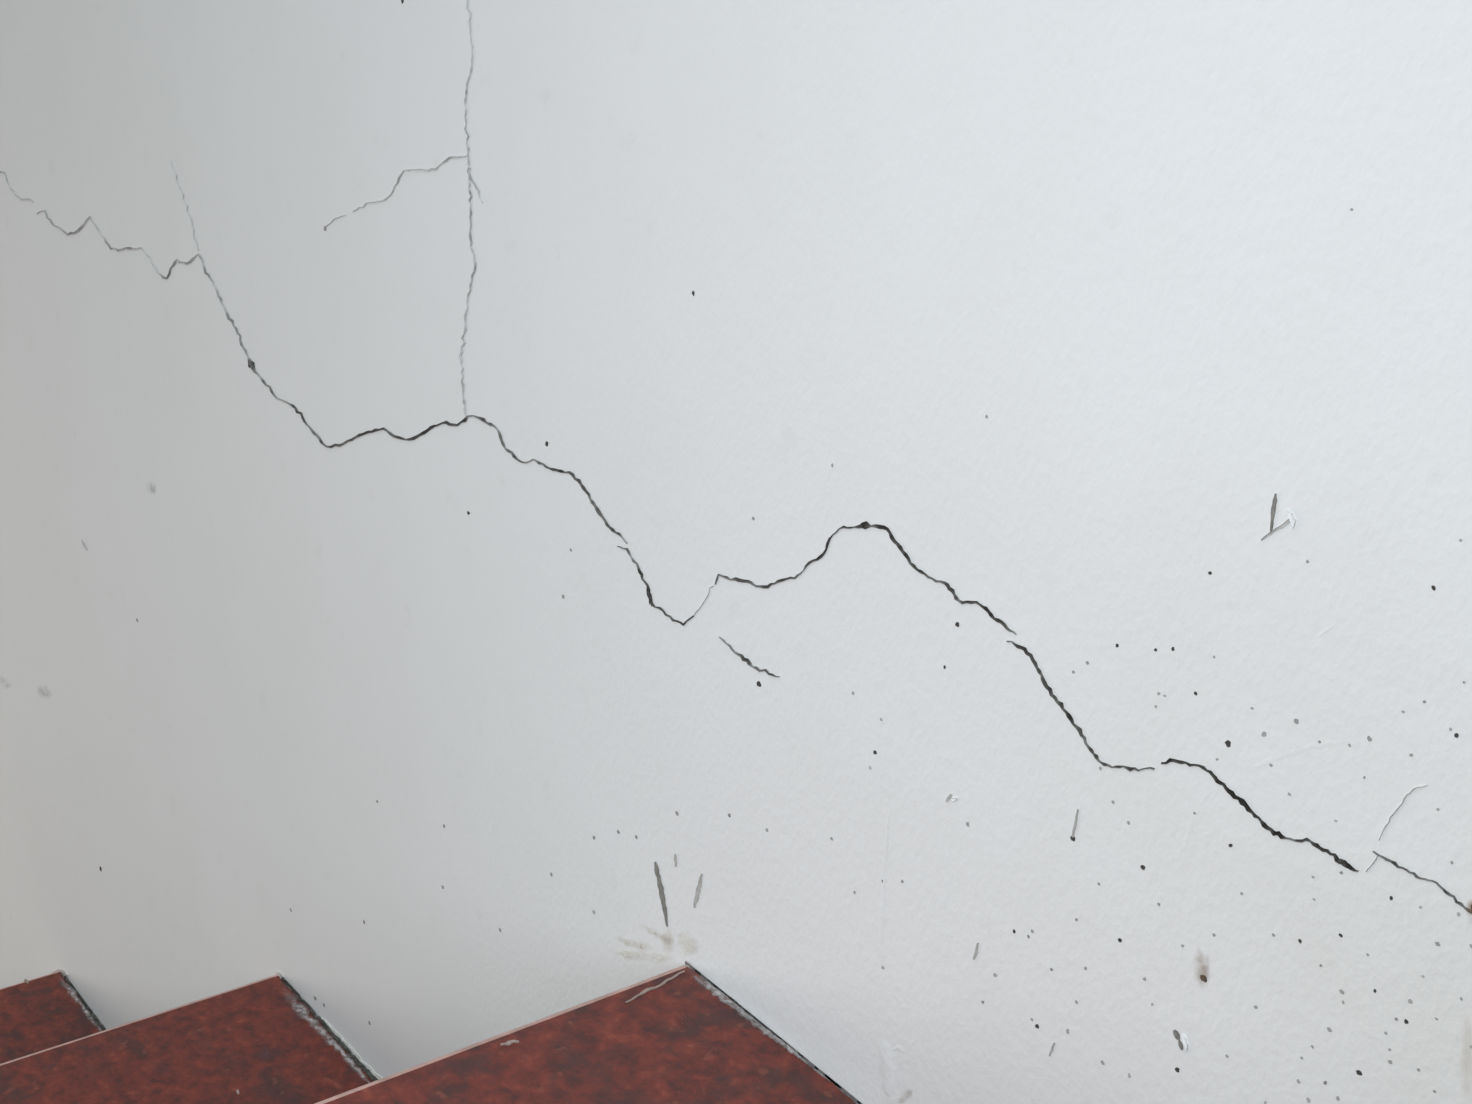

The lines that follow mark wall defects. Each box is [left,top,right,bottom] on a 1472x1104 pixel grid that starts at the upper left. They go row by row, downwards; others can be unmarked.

crack [0,171,34,203]
crack [36,0,1155,771]
crack [1161,758,1472,914]